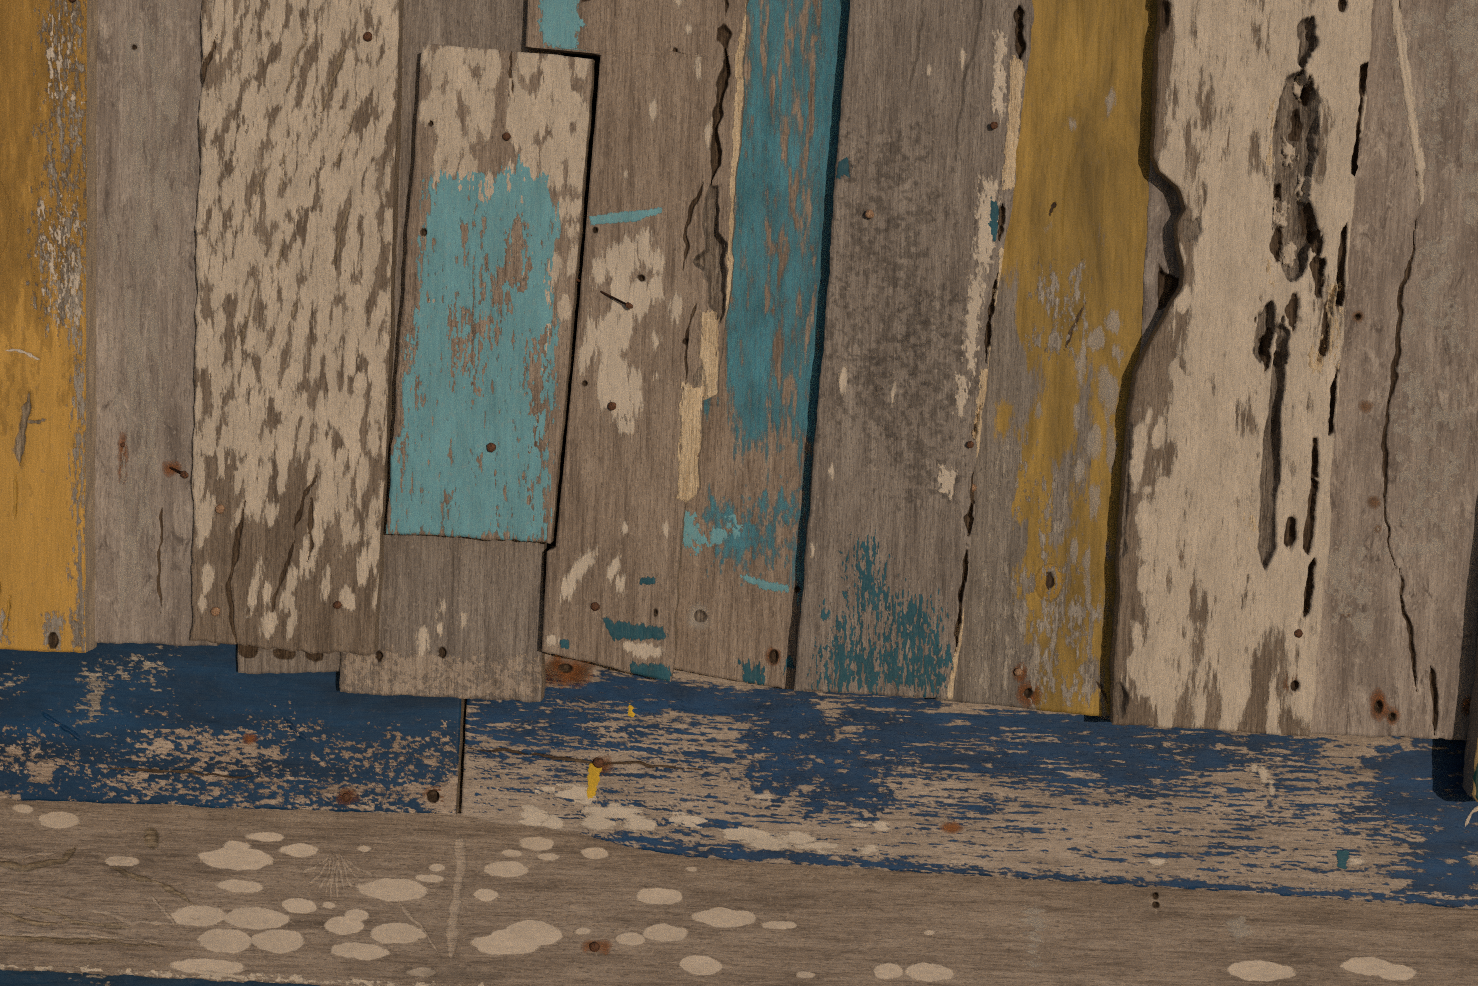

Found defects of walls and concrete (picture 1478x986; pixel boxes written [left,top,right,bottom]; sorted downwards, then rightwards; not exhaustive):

crack [683,0,730,269]
peeling [20,0,87,653]
peeling [192,0,682,662]
crack [684,305,696,385]
spalling [13,393,46,519]
peeling [465,0,1478,910]
crack [1381,156,1438,736]
peeling [0,609,29,698]
peeling [66,645,175,727]
peeling [0,702,466,817]
spalling [0,901,162,947]
peeling [0,964,435,986]